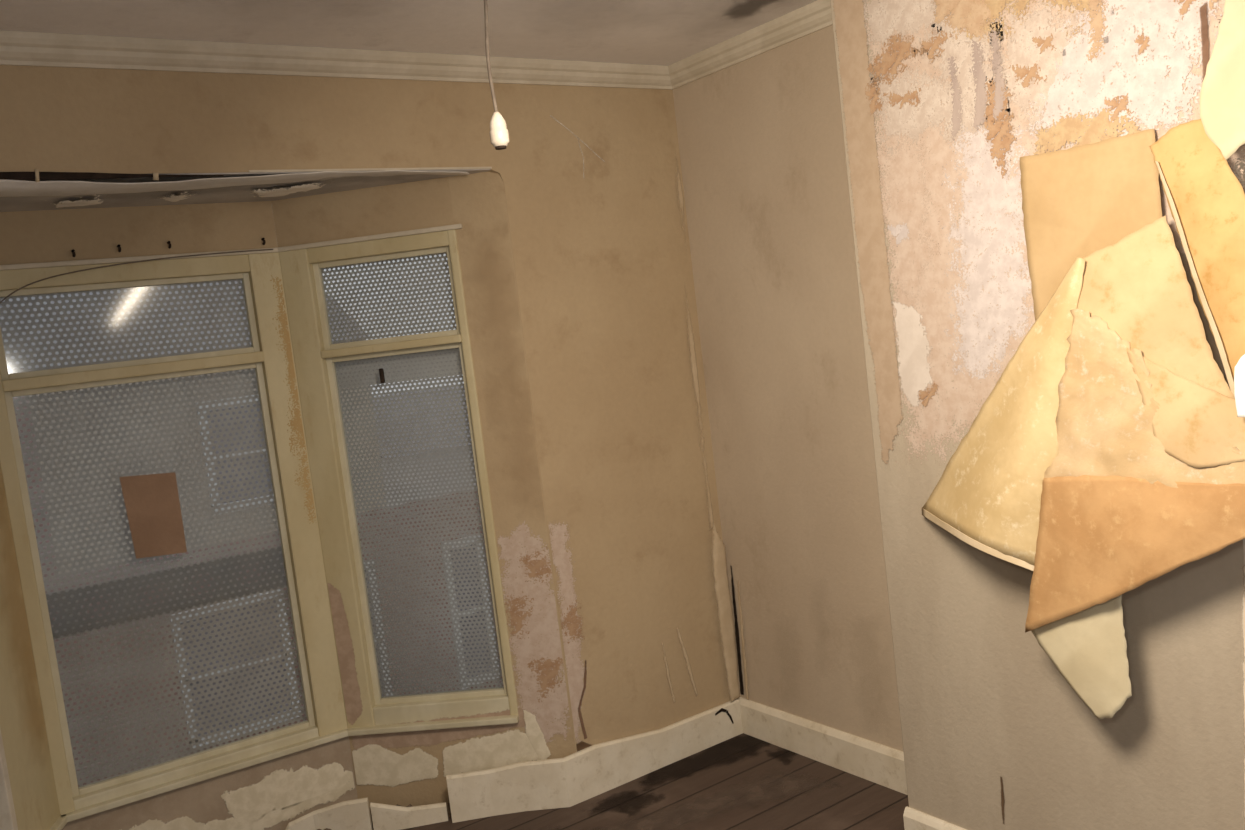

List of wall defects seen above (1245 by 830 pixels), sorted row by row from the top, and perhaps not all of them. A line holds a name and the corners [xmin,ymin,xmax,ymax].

peeling [863,0,1225,472]
peeling [1227,144,1245,193]
peeling [121,521,571,830]